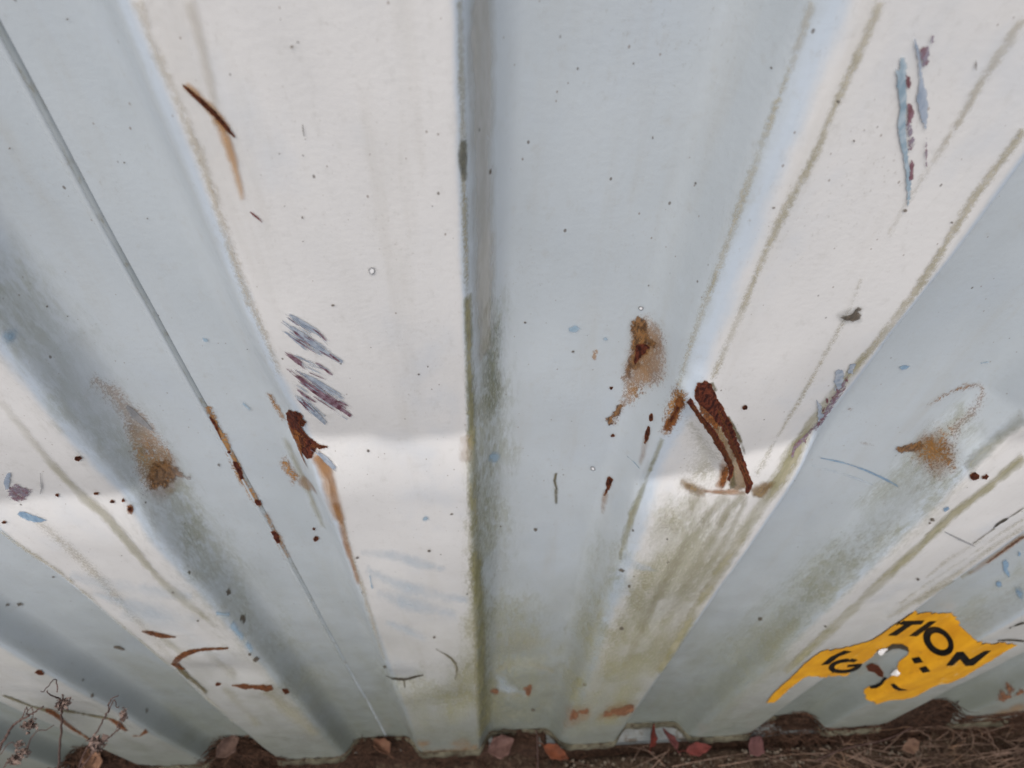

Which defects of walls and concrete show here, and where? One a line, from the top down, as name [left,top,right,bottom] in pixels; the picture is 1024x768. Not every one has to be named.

leakage [902,130,1024,308]
rust [606,316,656,437]
leakage [842,333,883,383]
rust [127,406,183,489]
rust [206,406,280,544]
rust [281,457,299,482]
rust [644,387,687,444]
leakage [715,426,746,490]
leakage [767,425,811,500]
rust [896,426,956,473]
leakage [883,458,1023,576]
rust [171,647,289,694]